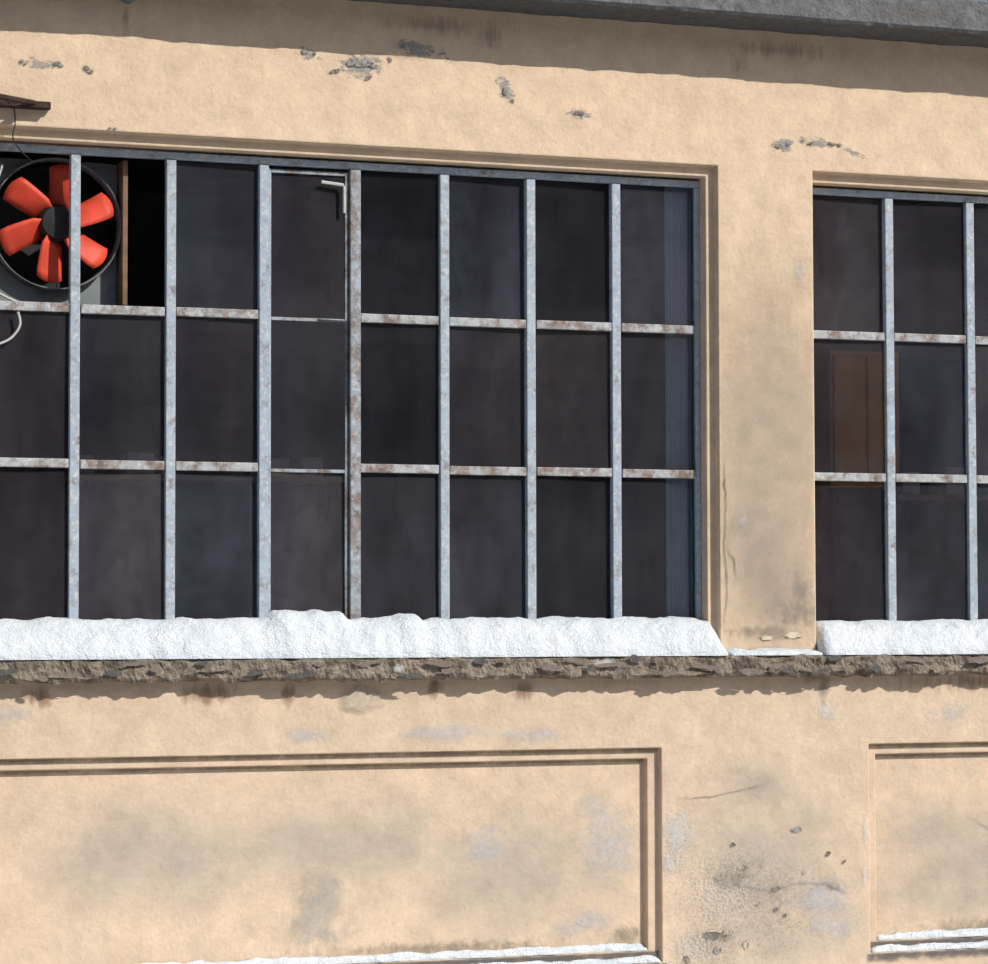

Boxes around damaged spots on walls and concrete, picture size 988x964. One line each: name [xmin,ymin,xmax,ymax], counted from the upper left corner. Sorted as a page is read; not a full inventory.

peeling [20,57,64,69]
peeling [330,40,448,80]
peeling [495,77,515,103]
peeling [772,138,864,158]